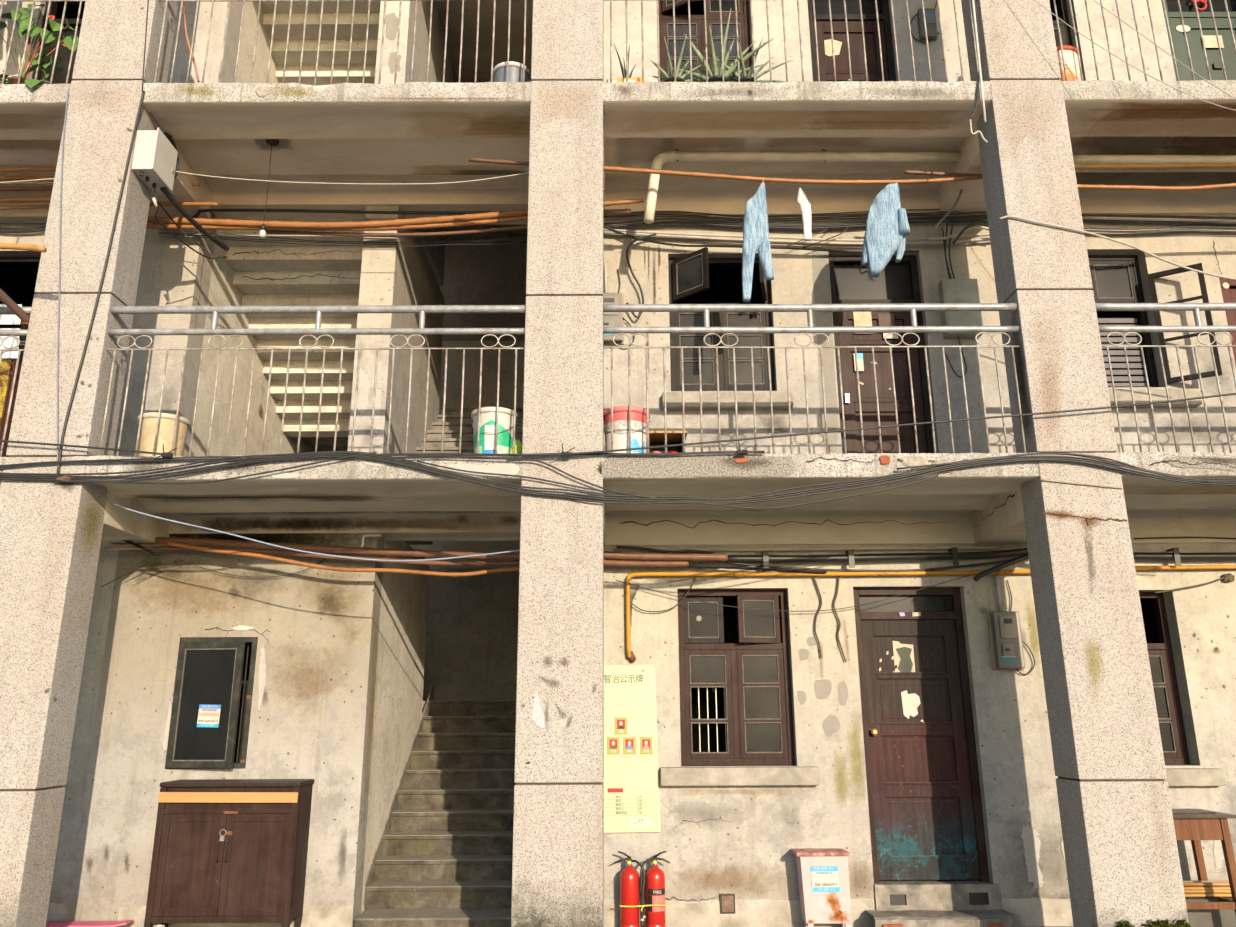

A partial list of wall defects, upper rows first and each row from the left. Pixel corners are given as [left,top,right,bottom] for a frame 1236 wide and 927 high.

crack [619,494,1015,528]
crack [1043,507,1128,526]
flaking render [799,637,817,661]
flaking render [797,679,848,737]
flaking render [1021,822,1044,889]
flaking render [1214,840,1224,872]